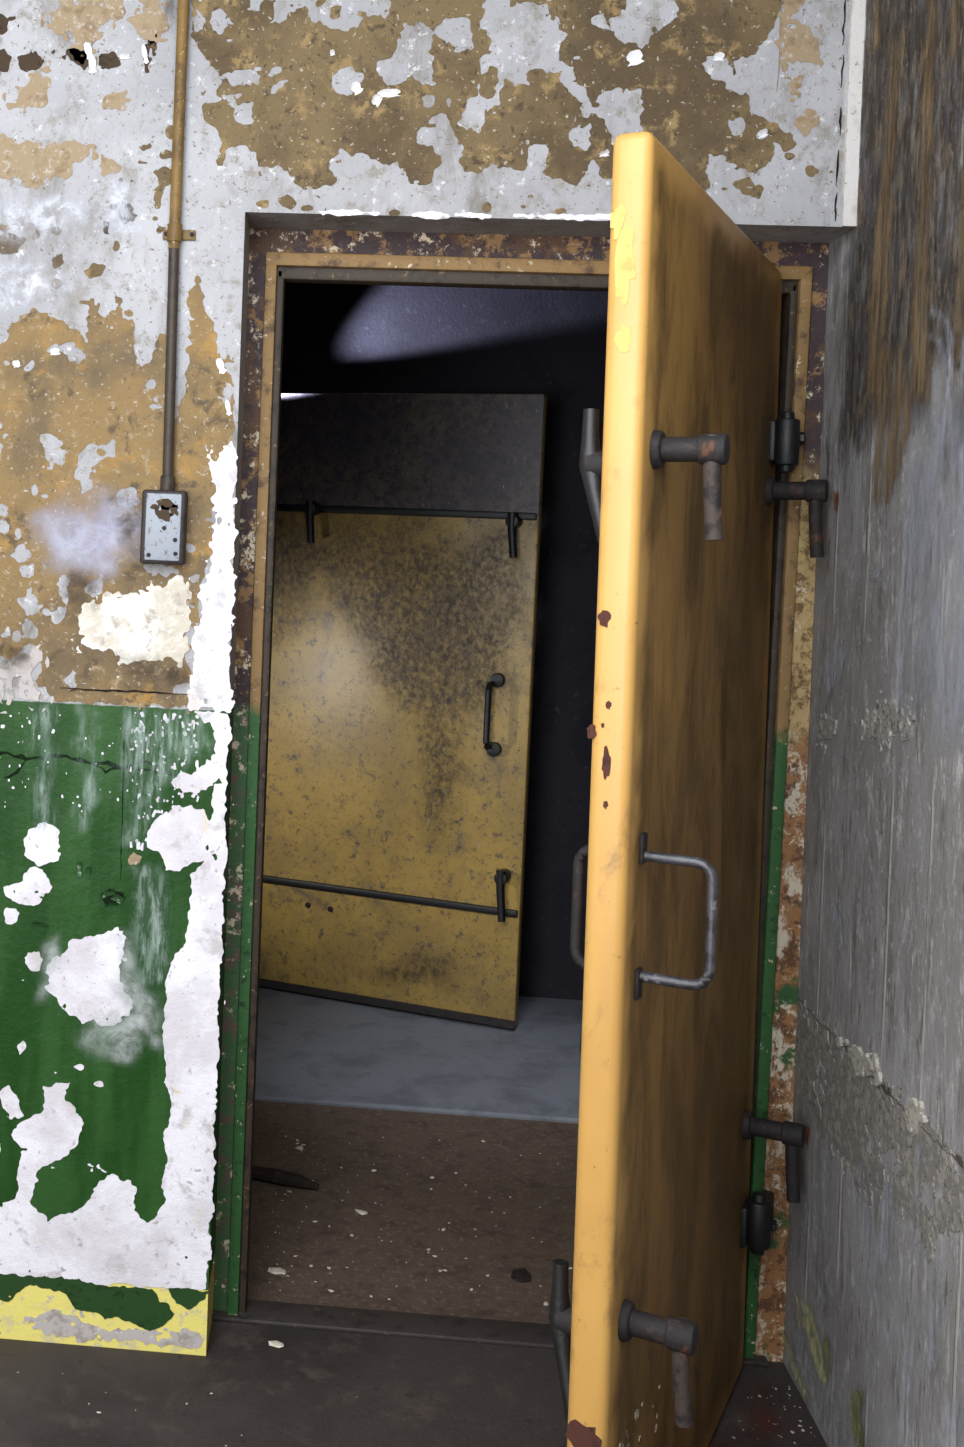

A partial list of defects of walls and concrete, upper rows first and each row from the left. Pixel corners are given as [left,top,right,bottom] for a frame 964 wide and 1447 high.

peeling [0,125,173,254]
peeling [52,254,64,289]
peeling [84,263,106,279]
peeling [0,275,239,1290]